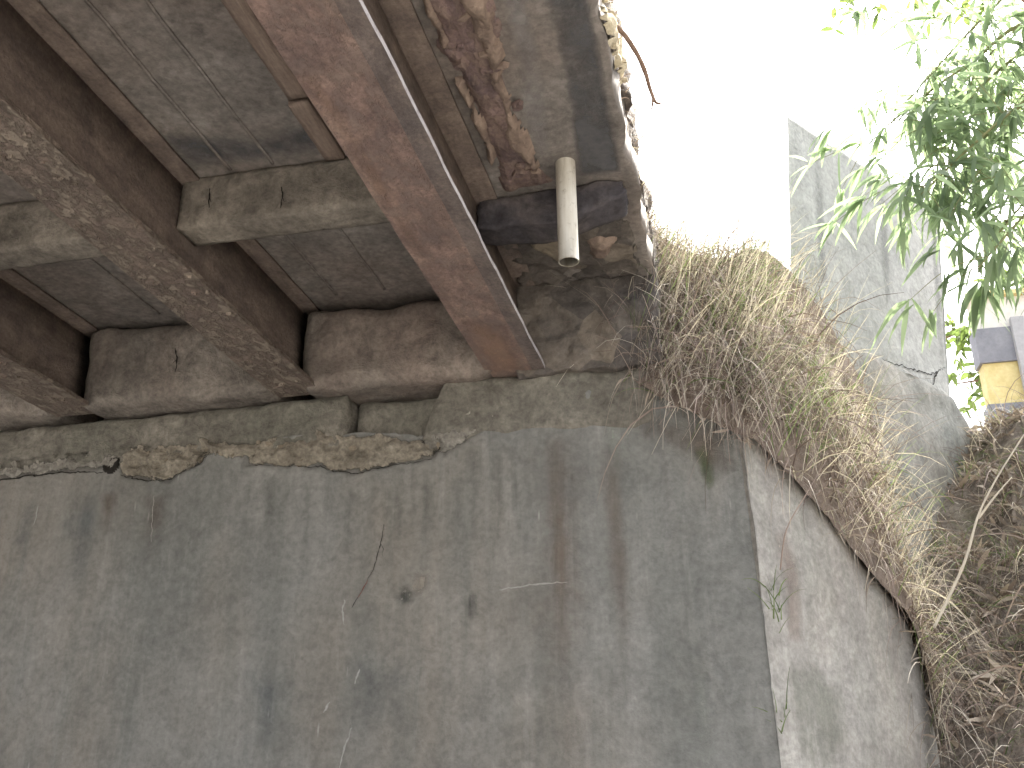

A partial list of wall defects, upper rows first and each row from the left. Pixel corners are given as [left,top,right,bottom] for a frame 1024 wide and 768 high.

spalling [423,0,553,192]
crack [882,358,944,385]
spalling [0,429,476,481]
crack [352,526,384,607]